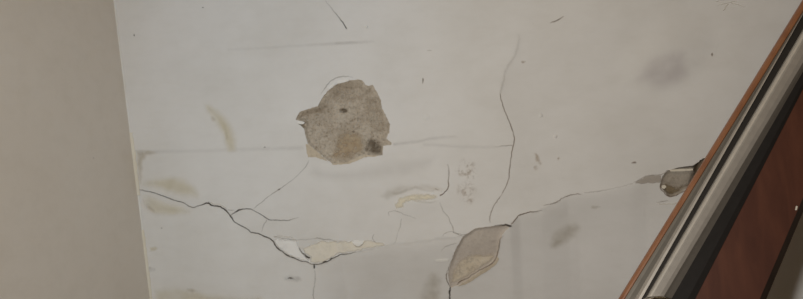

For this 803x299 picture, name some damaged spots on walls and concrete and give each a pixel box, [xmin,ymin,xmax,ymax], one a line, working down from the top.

flaking render [296,79,392,165]
flaking render [637,158,705,205]
crack [148,191,309,263]
flaking render [275,239,384,268]
flaking render [436,224,511,299]